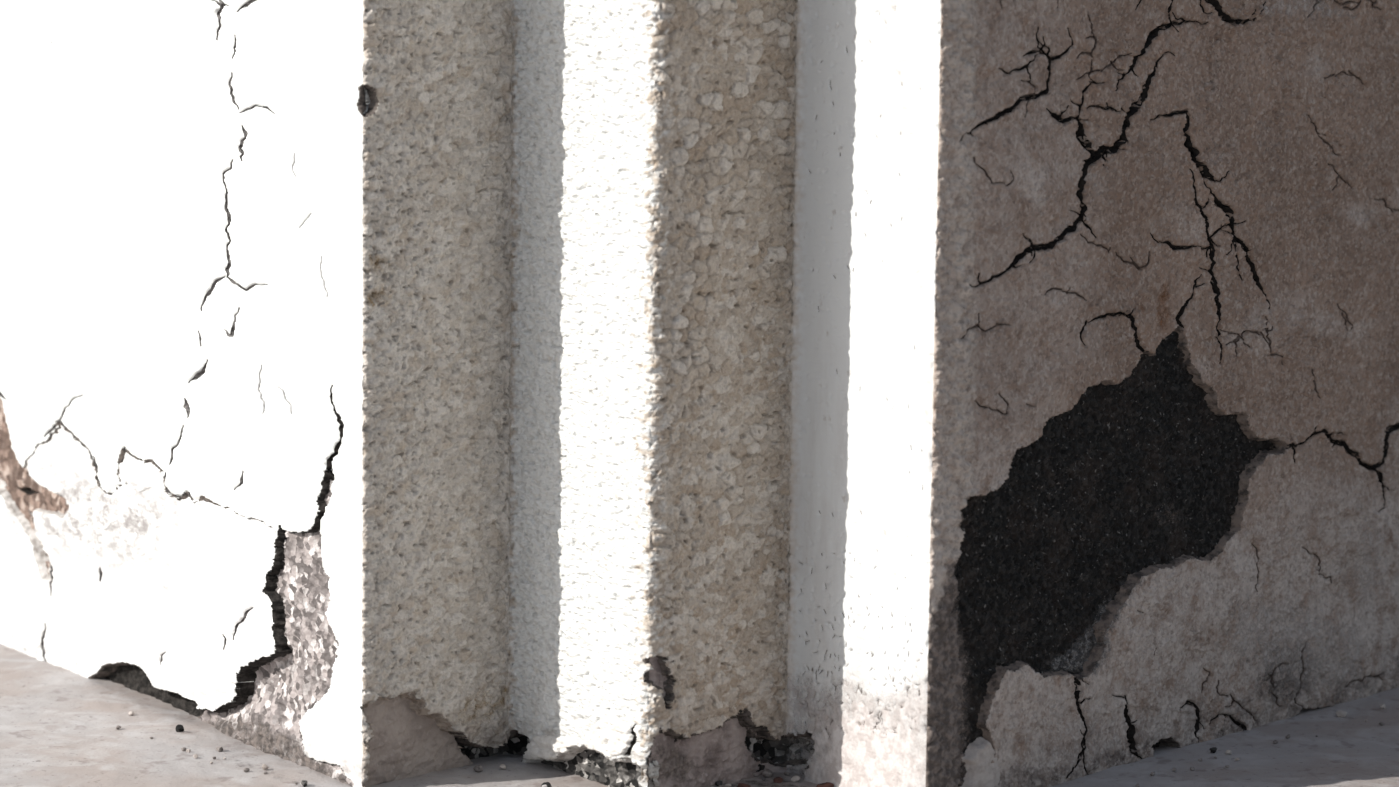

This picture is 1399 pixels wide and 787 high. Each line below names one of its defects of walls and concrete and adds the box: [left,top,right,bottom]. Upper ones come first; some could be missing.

crack [169,0,274,465]
crack [320,256,328,298]
crack [959,0,1399,512]
crack [257,365,292,414]
peeling [0,395,941,787]
flaking render [947,326,1288,787]
crack [1251,543,1260,592]
crack [1302,547,1332,583]
crack [1066,672,1142,778]
crack [1181,642,1307,743]
crack [1345,672,1385,687]